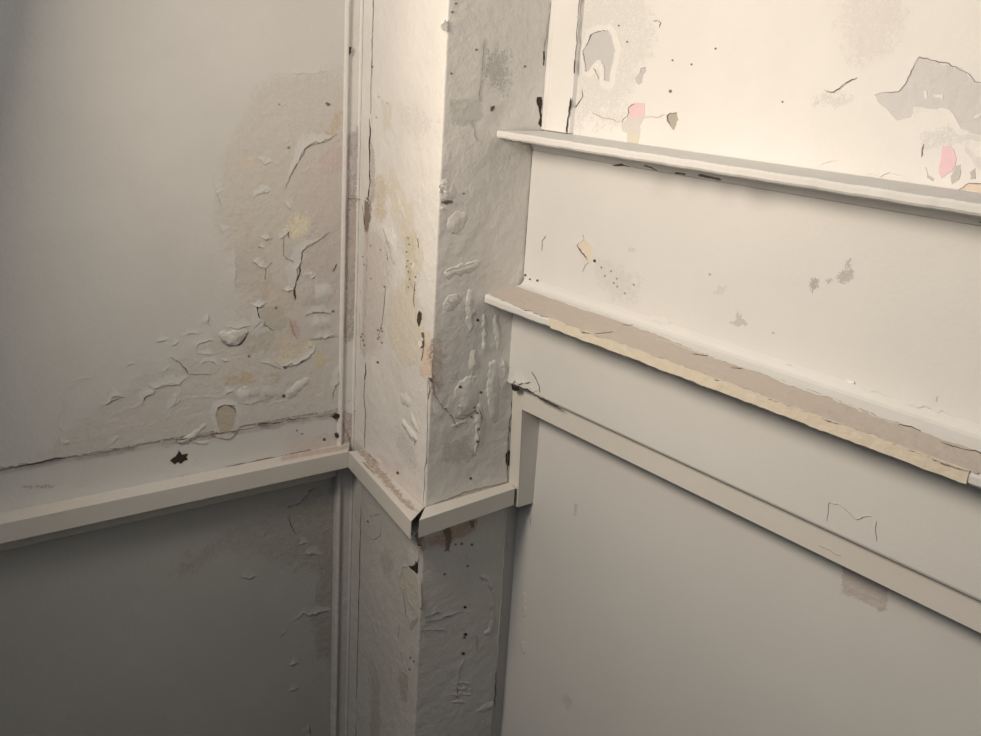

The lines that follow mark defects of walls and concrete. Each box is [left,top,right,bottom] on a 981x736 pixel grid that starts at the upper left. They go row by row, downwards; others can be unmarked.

peeling [580,22,628,90]
peeling [621,103,645,144]
peeling [662,107,683,137]
peeling [865,43,981,192]
water stain [25,63,446,465]
peeling [417,311,425,348]
crack [0,363,375,473]
peeling [208,386,242,439]
peeling [490,274,981,484]